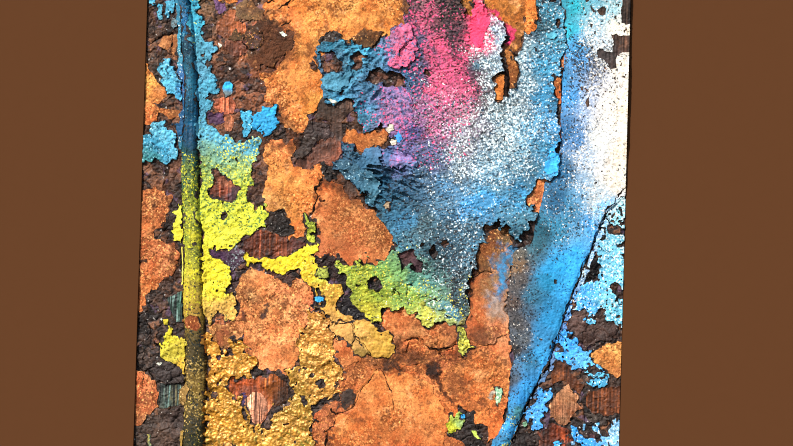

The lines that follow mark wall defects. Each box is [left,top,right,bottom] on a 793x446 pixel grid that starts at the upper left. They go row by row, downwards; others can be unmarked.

corrosion [138,186,183,312]
corrosion [228,0,410,319]
peeling [142,0,631,446]
corrosion [310,225,514,446]